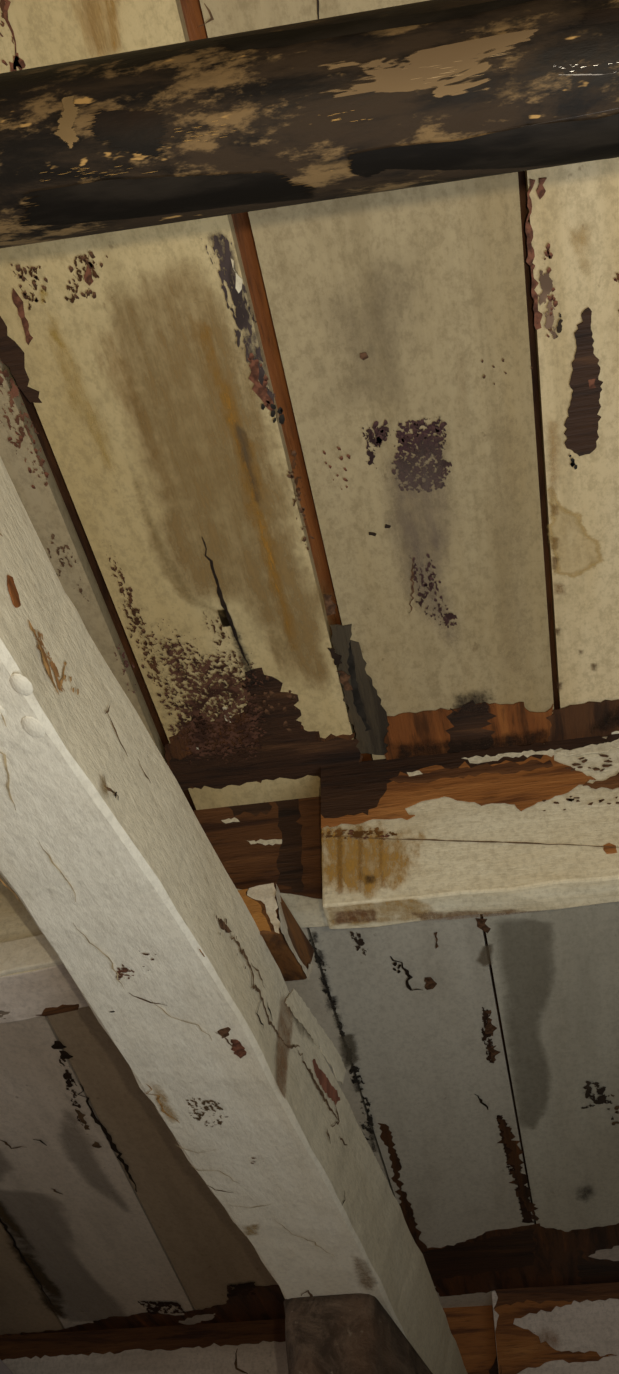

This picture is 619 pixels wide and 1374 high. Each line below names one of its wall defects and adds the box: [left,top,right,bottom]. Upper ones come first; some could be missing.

peeling [0,0,26,72]
peeling [320,29,538,122]
peeling [16,96,317,226]
peeling [11,264,48,345]
peeling [65,251,108,303]
peeling [347,114,619,469]
water stain [117,234,326,682]
peeling [323,417,452,493]
peeling [106,551,619,979]
peeling [217,1027,247,1059]
peeling [481,1007,500,1064]
peeling [378,1094,619,1374]